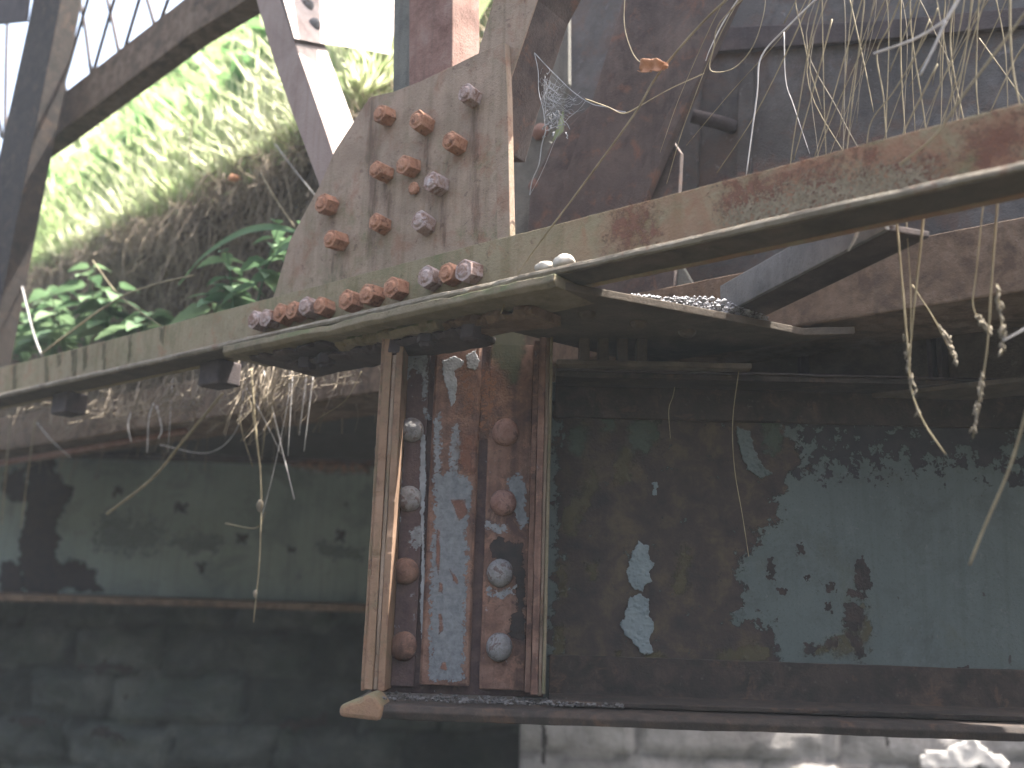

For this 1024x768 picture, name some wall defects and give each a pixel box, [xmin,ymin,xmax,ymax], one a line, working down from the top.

corrosion [714,136,951,221]
corrosion [960,108,1024,170]
peeling [399,350,480,682]
peeling [485,472,529,534]
peeling [546,400,1024,662]
peeling [485,584,517,599]
corrosion [489,536,527,640]
corrosion [766,557,788,596]
corrosion [803,555,874,660]